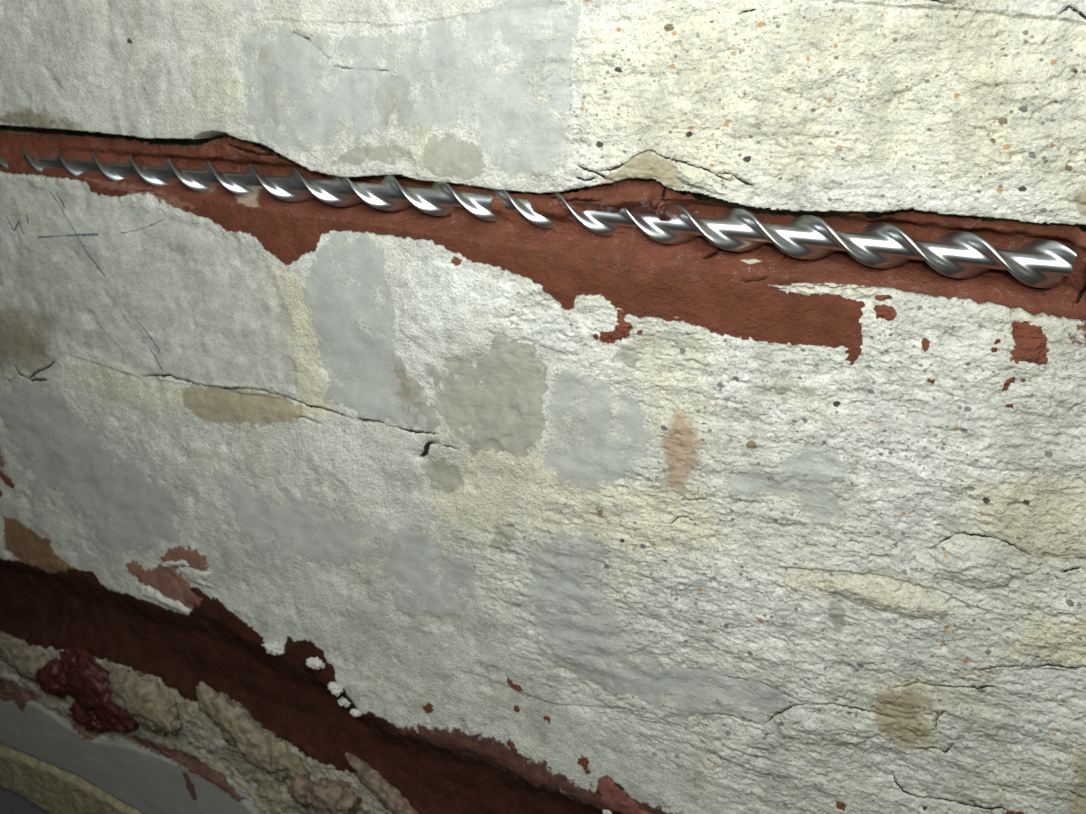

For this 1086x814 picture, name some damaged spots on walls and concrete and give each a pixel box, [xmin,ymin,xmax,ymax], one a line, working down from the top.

crack [229,145,282,157]
crack [551,149,753,211]
peeling [673,163,727,195]
peeling [398,260,598,360]
crack [143,374,456,457]
peeling [161,560,216,589]
peeling [139,585,190,615]